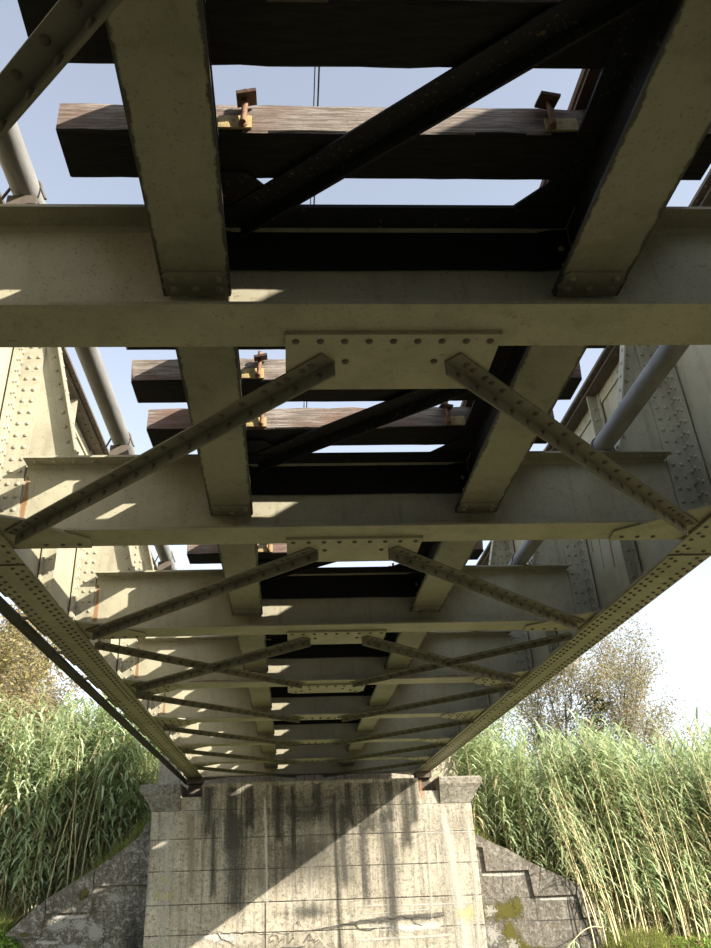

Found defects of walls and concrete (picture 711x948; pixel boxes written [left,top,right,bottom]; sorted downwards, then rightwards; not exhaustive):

leakage [188,781,521,948]
crack [159,915,444,945]
leakage [540,878,590,939]